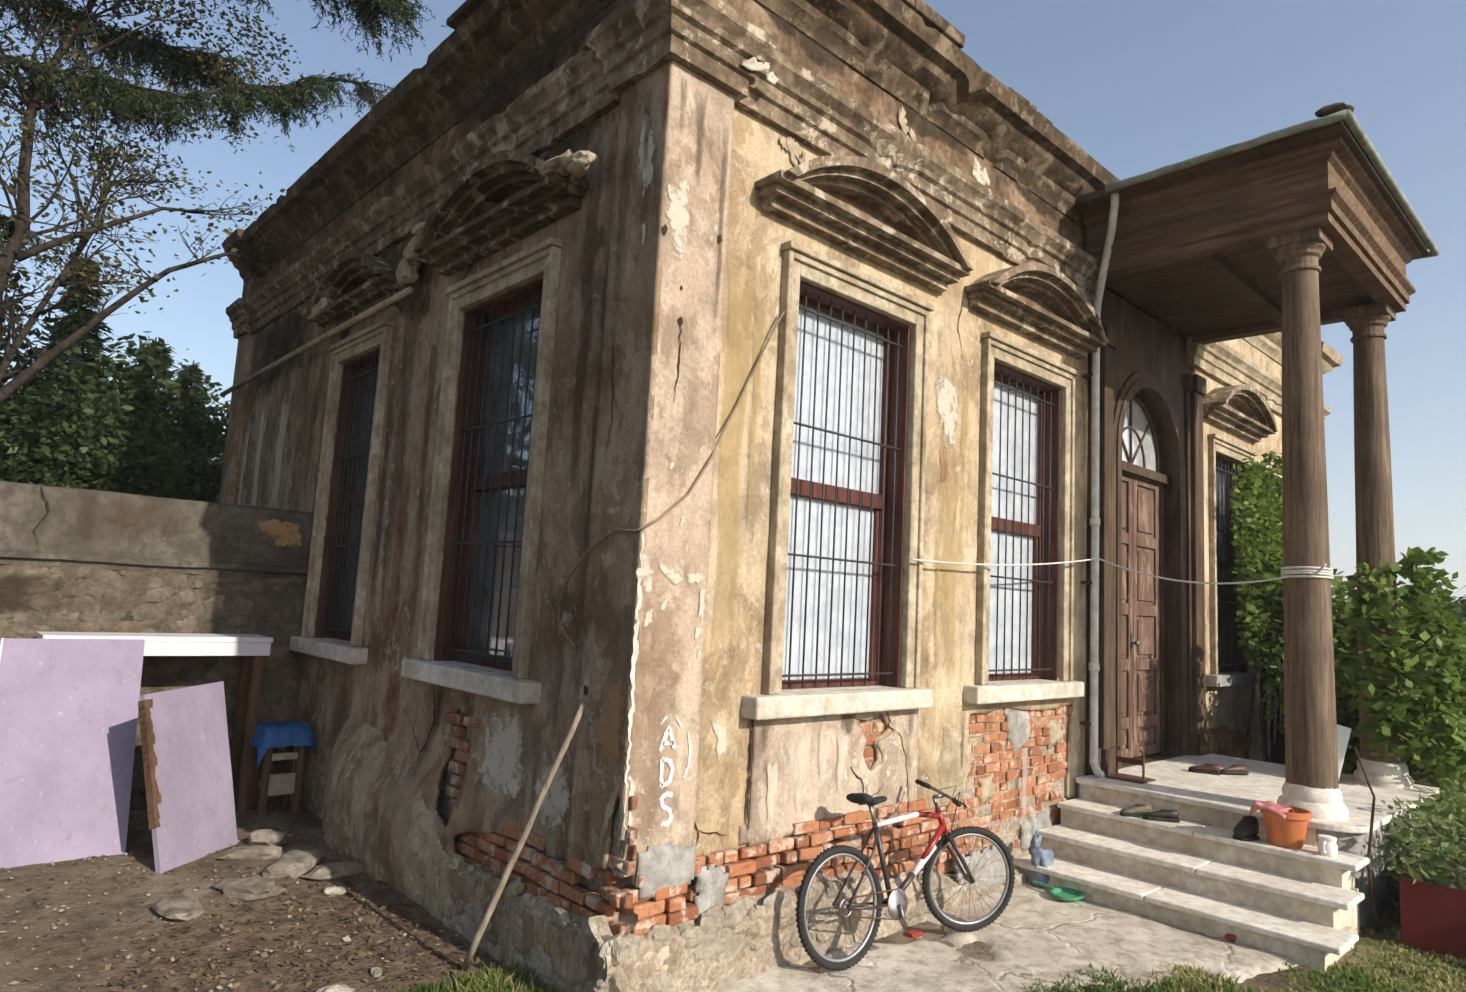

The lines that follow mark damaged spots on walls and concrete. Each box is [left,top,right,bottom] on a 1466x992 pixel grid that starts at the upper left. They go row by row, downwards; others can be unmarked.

flaking render [638,118,690,259]
damp [718,164,726,286]
flaking render [937,376,959,480]
flaking render [257,517,302,547]
flaking render [443,712,480,820]
flaking render [456,533,1072,936]